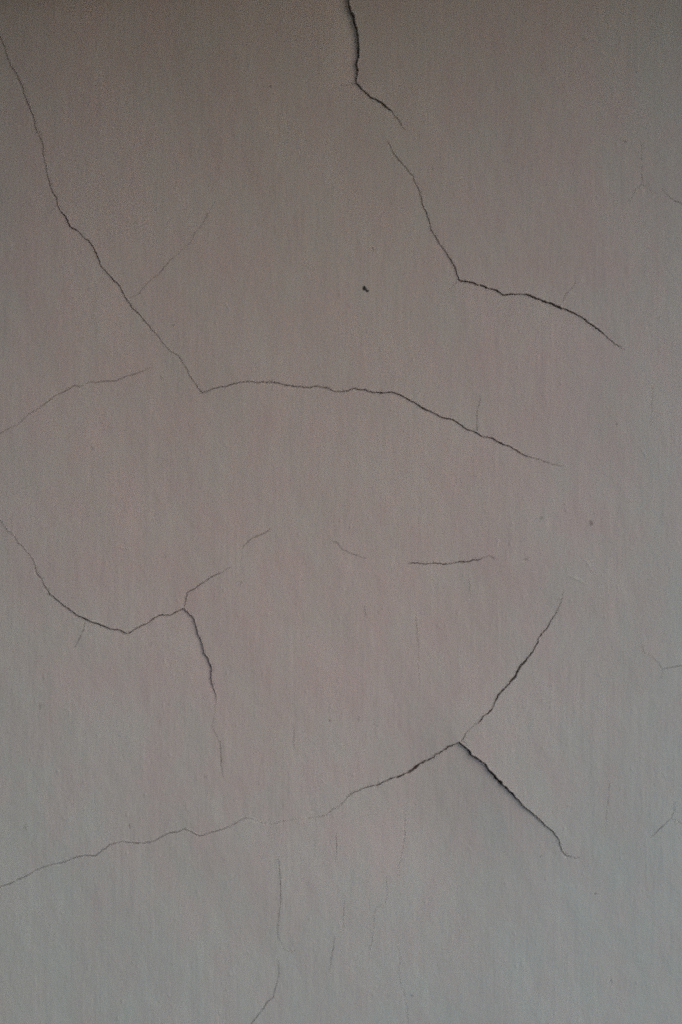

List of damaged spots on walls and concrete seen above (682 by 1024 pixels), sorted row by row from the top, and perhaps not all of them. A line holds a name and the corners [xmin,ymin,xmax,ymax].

crack [0,35,544,462]
crack [347,0,626,351]
crack [0,519,231,705]
crack [326,590,581,859]